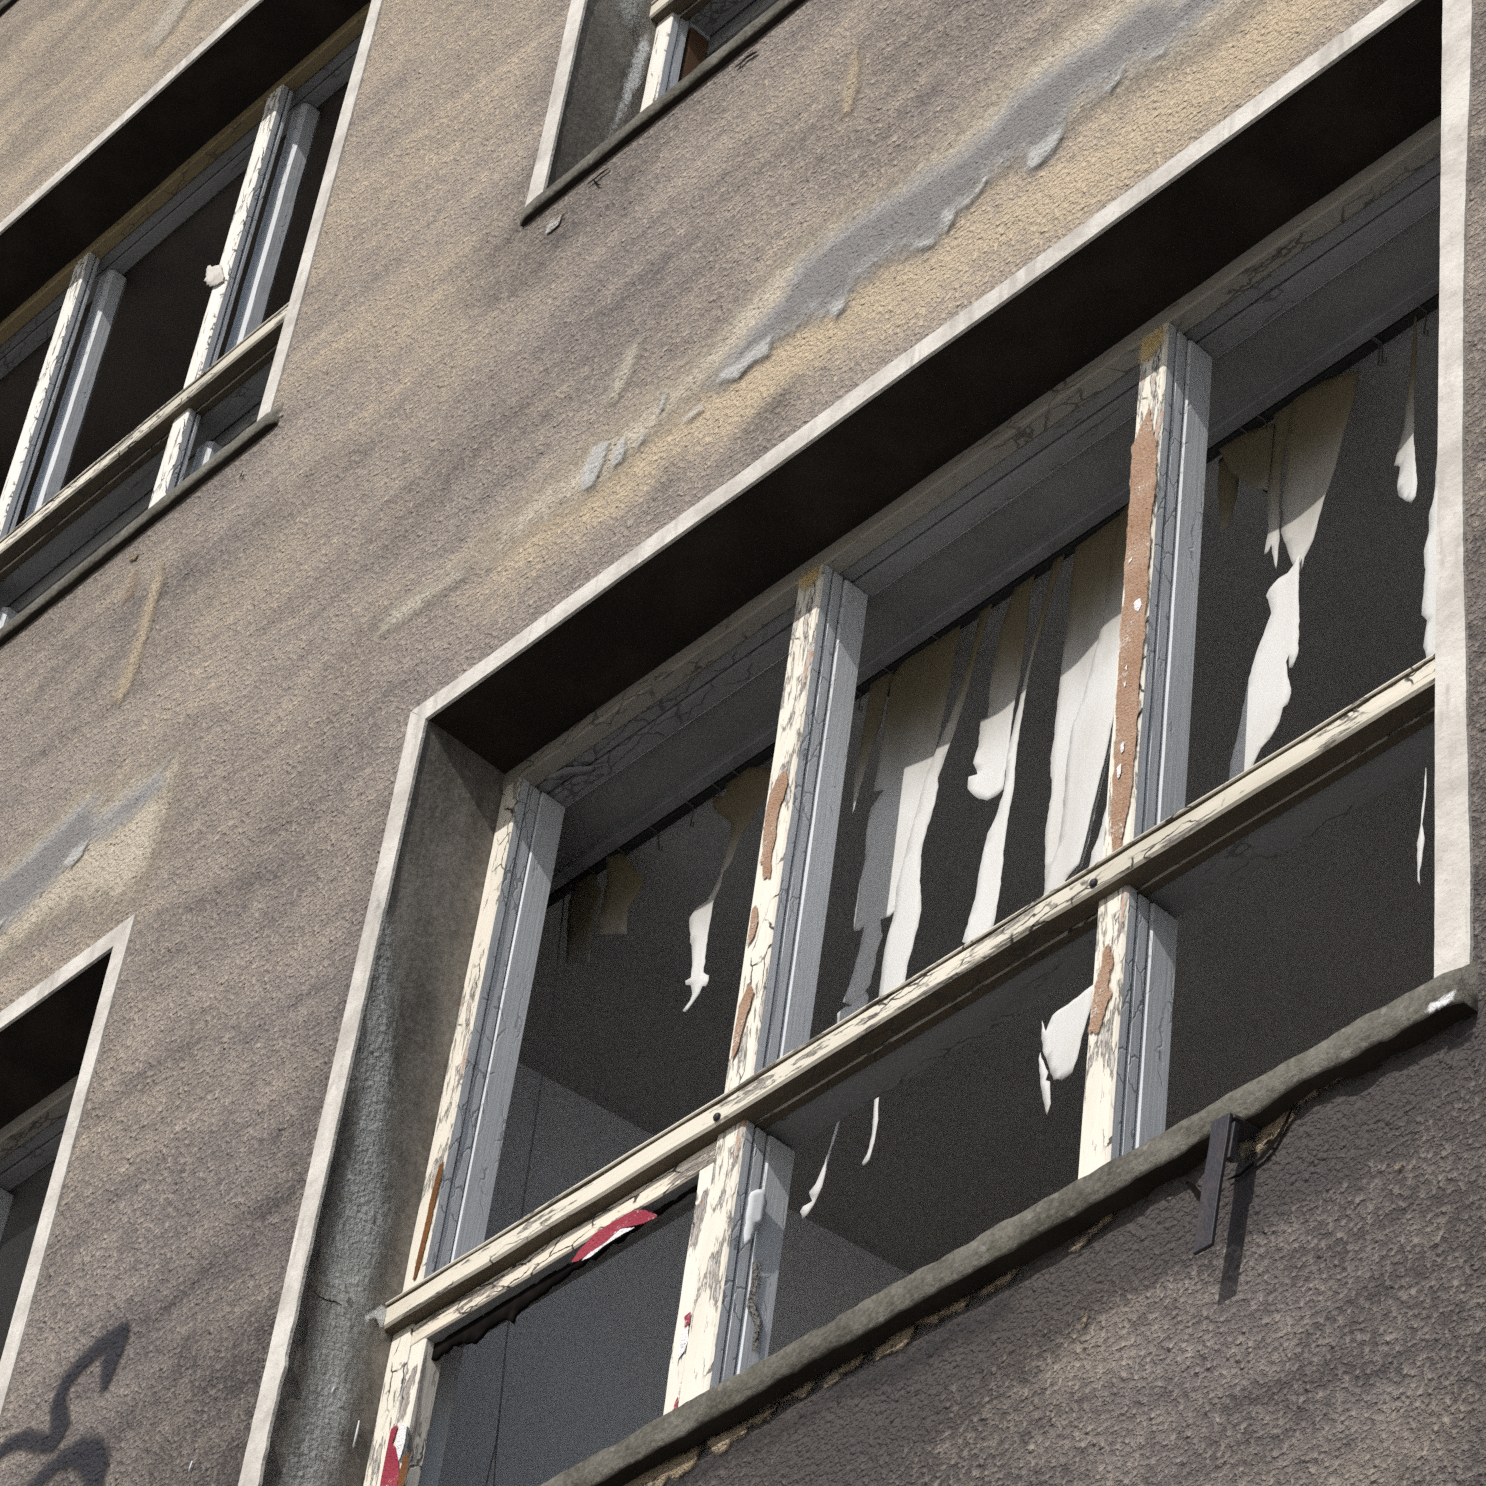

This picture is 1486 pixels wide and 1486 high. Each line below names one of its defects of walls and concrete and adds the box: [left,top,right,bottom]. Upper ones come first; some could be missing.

flaking render [488,0,1259,564]
peeling [1110,407,1157,852]
peeling [760,770,788,879]
peeling [746,905,758,946]
peeling [730,983,754,1062]
peeling [1088,944,1113,1033]
peeling [413,1160,444,1280]
peeling [744,1189,767,1352]
flaking render [1072,1213,1112,1250]
flaking render [623,1270,1017,1486]
peeling [380,1423,409,1486]